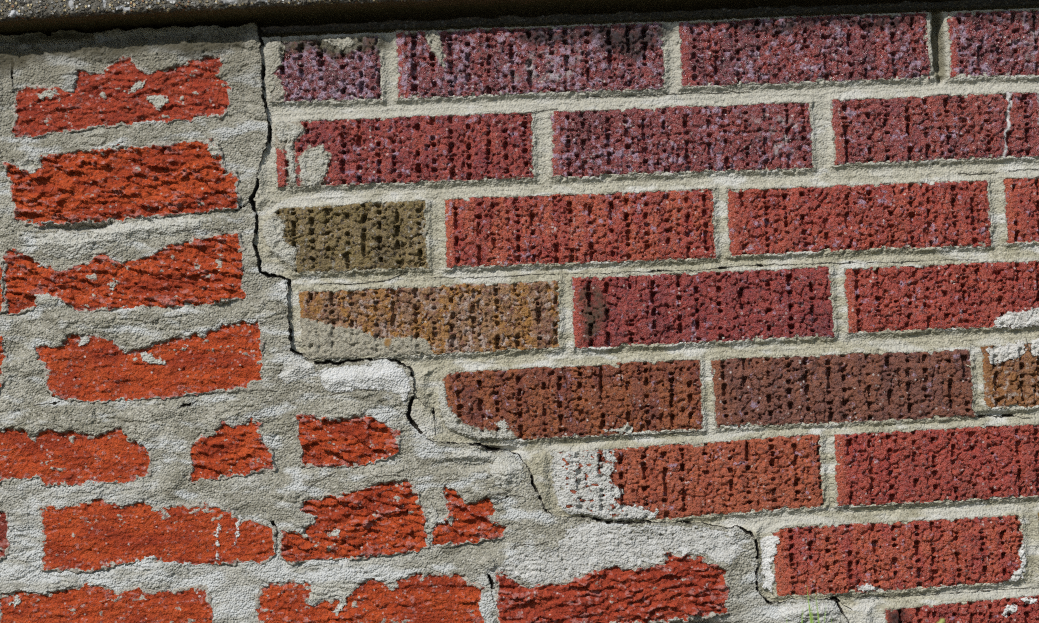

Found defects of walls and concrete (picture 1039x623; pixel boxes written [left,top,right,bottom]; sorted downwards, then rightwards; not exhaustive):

crack [171,26,1032,623]
spalling [499,448,744,587]